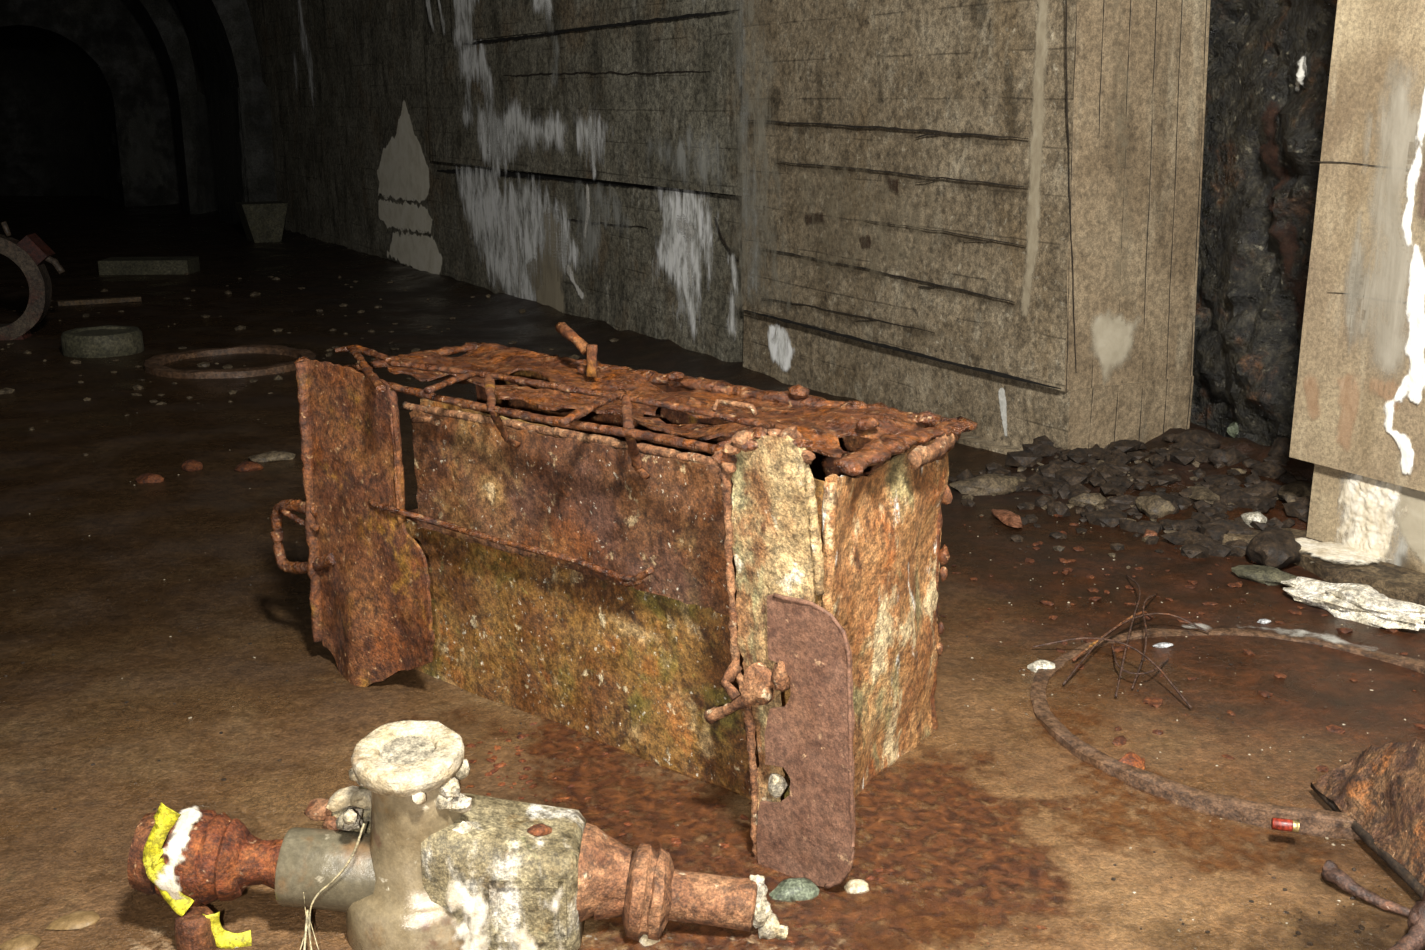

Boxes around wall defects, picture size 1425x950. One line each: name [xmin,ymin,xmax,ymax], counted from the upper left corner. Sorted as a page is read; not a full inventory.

spalling [377,101,442,274]
damp [426,0,620,301]
damp [657,135,718,335]
damp [729,85,777,333]
damp [1295,55,1307,90]
damp [1295,80,1425,566]